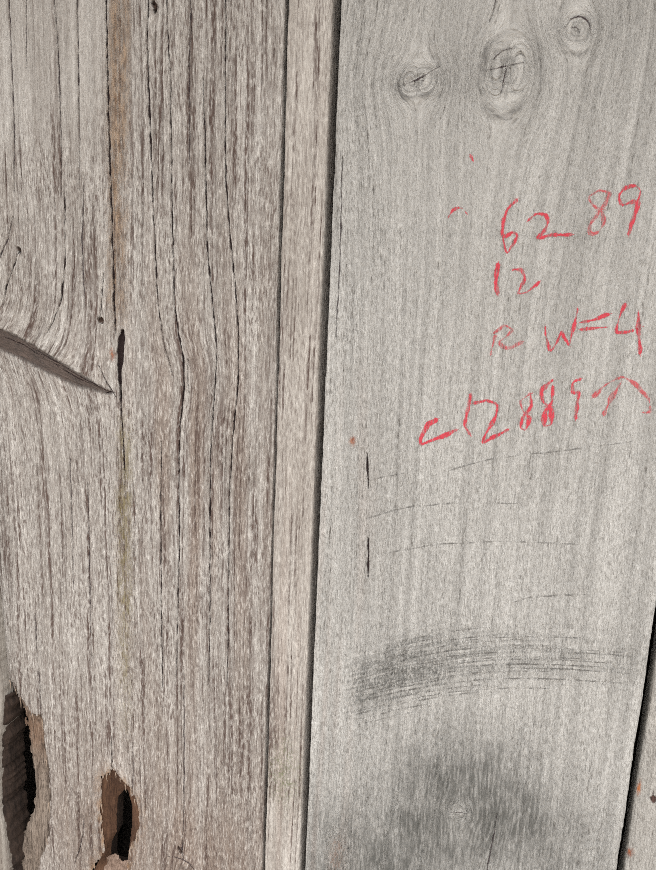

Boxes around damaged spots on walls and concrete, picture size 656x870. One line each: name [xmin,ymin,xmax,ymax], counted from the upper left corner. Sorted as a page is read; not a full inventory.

crack [50,0,125,468]